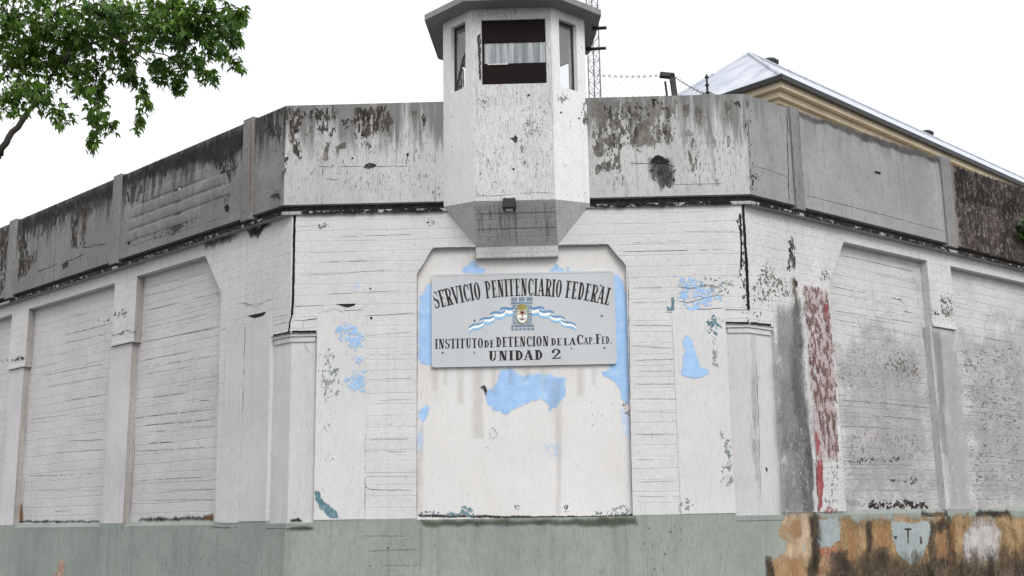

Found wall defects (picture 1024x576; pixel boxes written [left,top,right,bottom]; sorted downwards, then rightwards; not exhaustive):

leakage [22,131,243,233]
leakage [9,190,281,303]
leakage [650,158,676,188]
peeling [583,98,759,193]
crack [565,99,790,497]
leakage [756,165,1024,270]
crack [130,215,471,510]
peeling [481,368,566,415]
peeling [602,274,630,441]
leakage [775,278,814,513]
peeling [667,216,931,576]
peeling [962,516,1001,566]